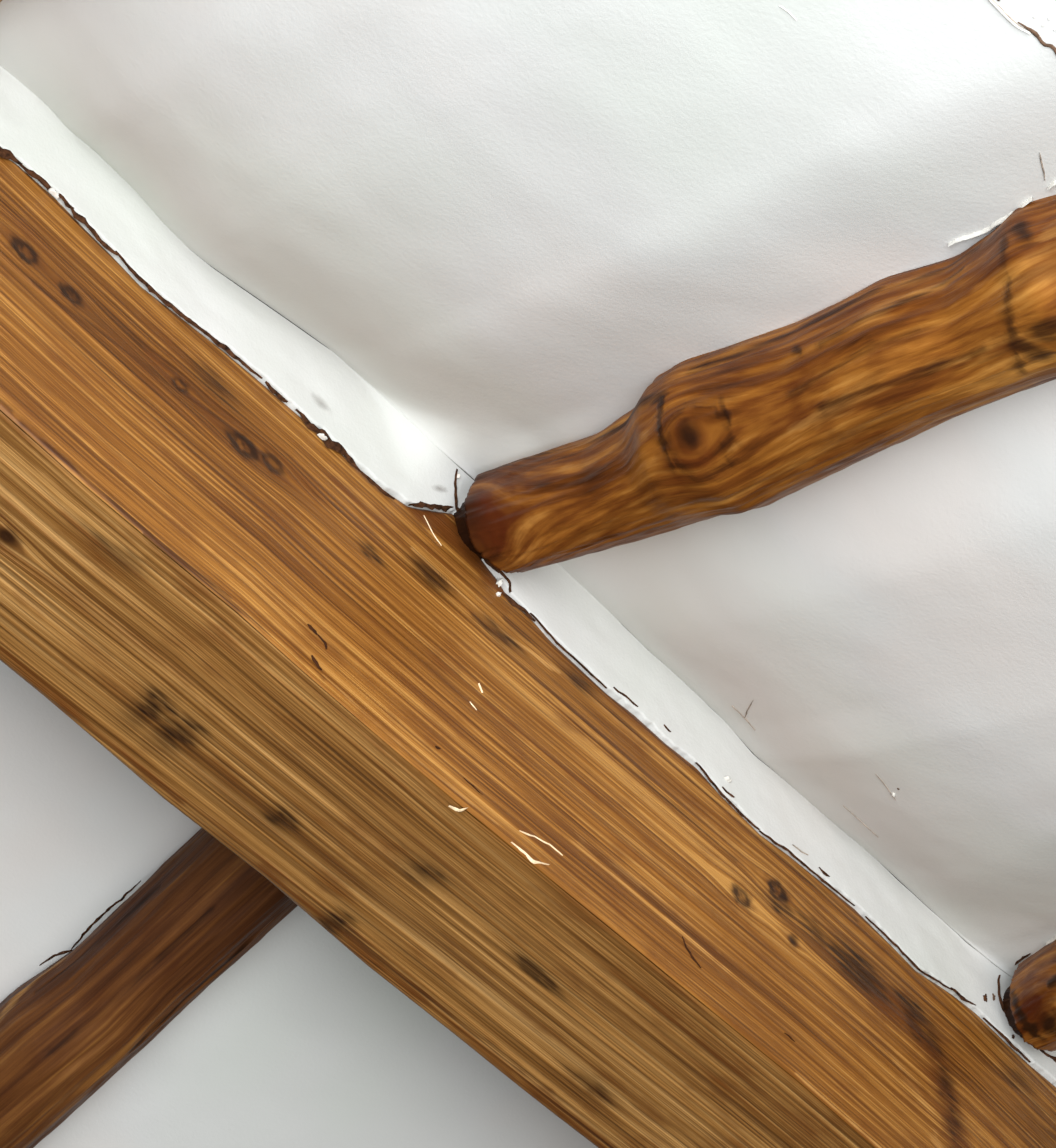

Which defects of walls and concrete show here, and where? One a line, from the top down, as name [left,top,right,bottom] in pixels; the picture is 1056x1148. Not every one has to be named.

crack [989,0,1056,54]
crack [948,154,1056,247]
crack [0,147,461,512]
crack [483,558,639,707]
crack [695,762,1056,1063]